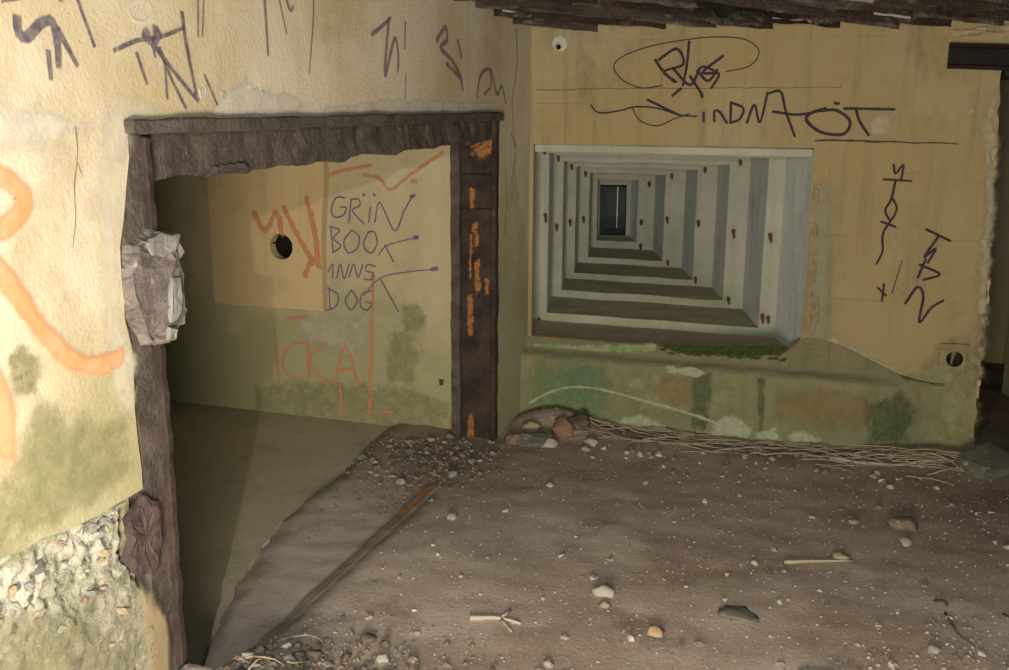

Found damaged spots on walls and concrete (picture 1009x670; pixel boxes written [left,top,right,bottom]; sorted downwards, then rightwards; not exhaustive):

corrosion [471,135,492,158]
corrosion [467,221,489,336]
leakage [529,374,820,443]
spalling [0,499,153,670]